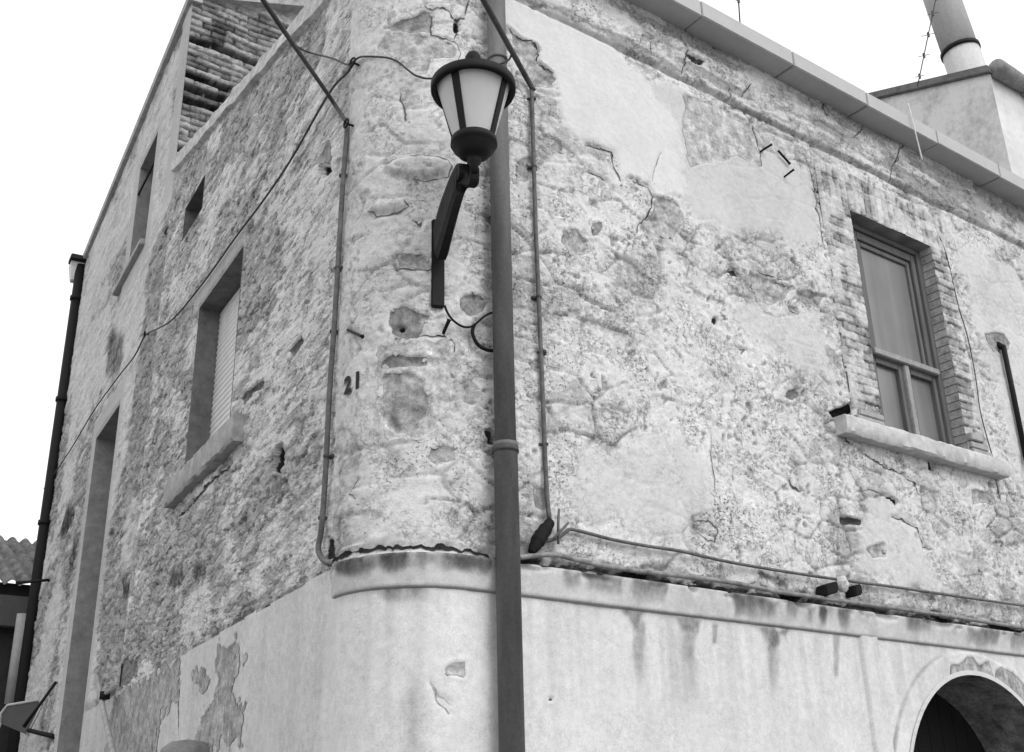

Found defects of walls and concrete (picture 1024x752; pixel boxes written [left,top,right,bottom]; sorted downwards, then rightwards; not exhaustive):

crack [425,0,470,60]
crack [585,145,661,233]
flaking render [561,222,602,256]
flaking render [640,196,684,239]
flaking render [750,274,823,314]
flaking render [374,306,462,465]
flaking render [786,377,803,400]
hole [829,404,851,418]
crack [825,419,931,550]
spalling [328,539,336,559]
peeling [104,609,255,752]
flaking render [445,662,465,677]